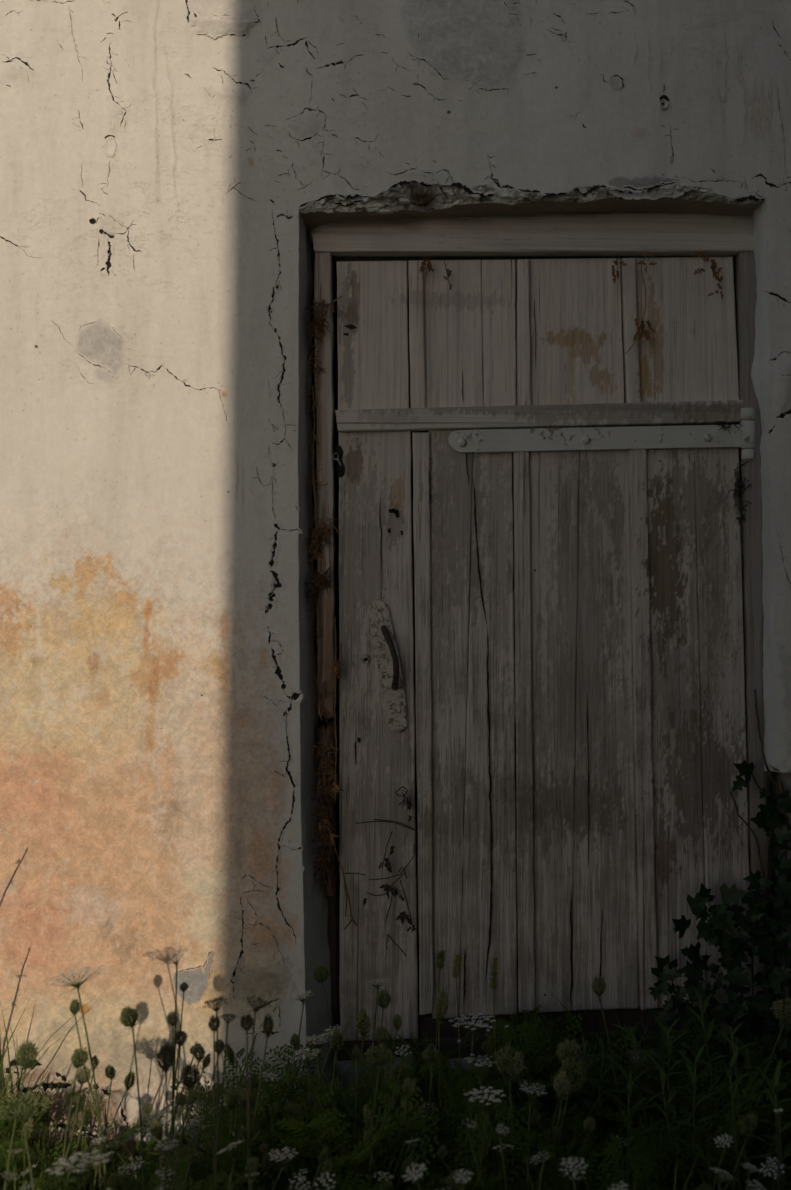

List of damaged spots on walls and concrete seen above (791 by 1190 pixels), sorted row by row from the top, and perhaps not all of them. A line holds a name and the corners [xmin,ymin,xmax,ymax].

crack [5,9,24,17]
crack [1,54,34,88]
crack [56,0,132,130]
crack [0,235,43,259]
crack [79,159,143,276]
spalling [299,172,767,214]
crack [764,290,790,307]
peeling [70,314,129,388]
crack [767,350,791,435]
crack [184,0,636,1036]
damp [0,420,304,1188]